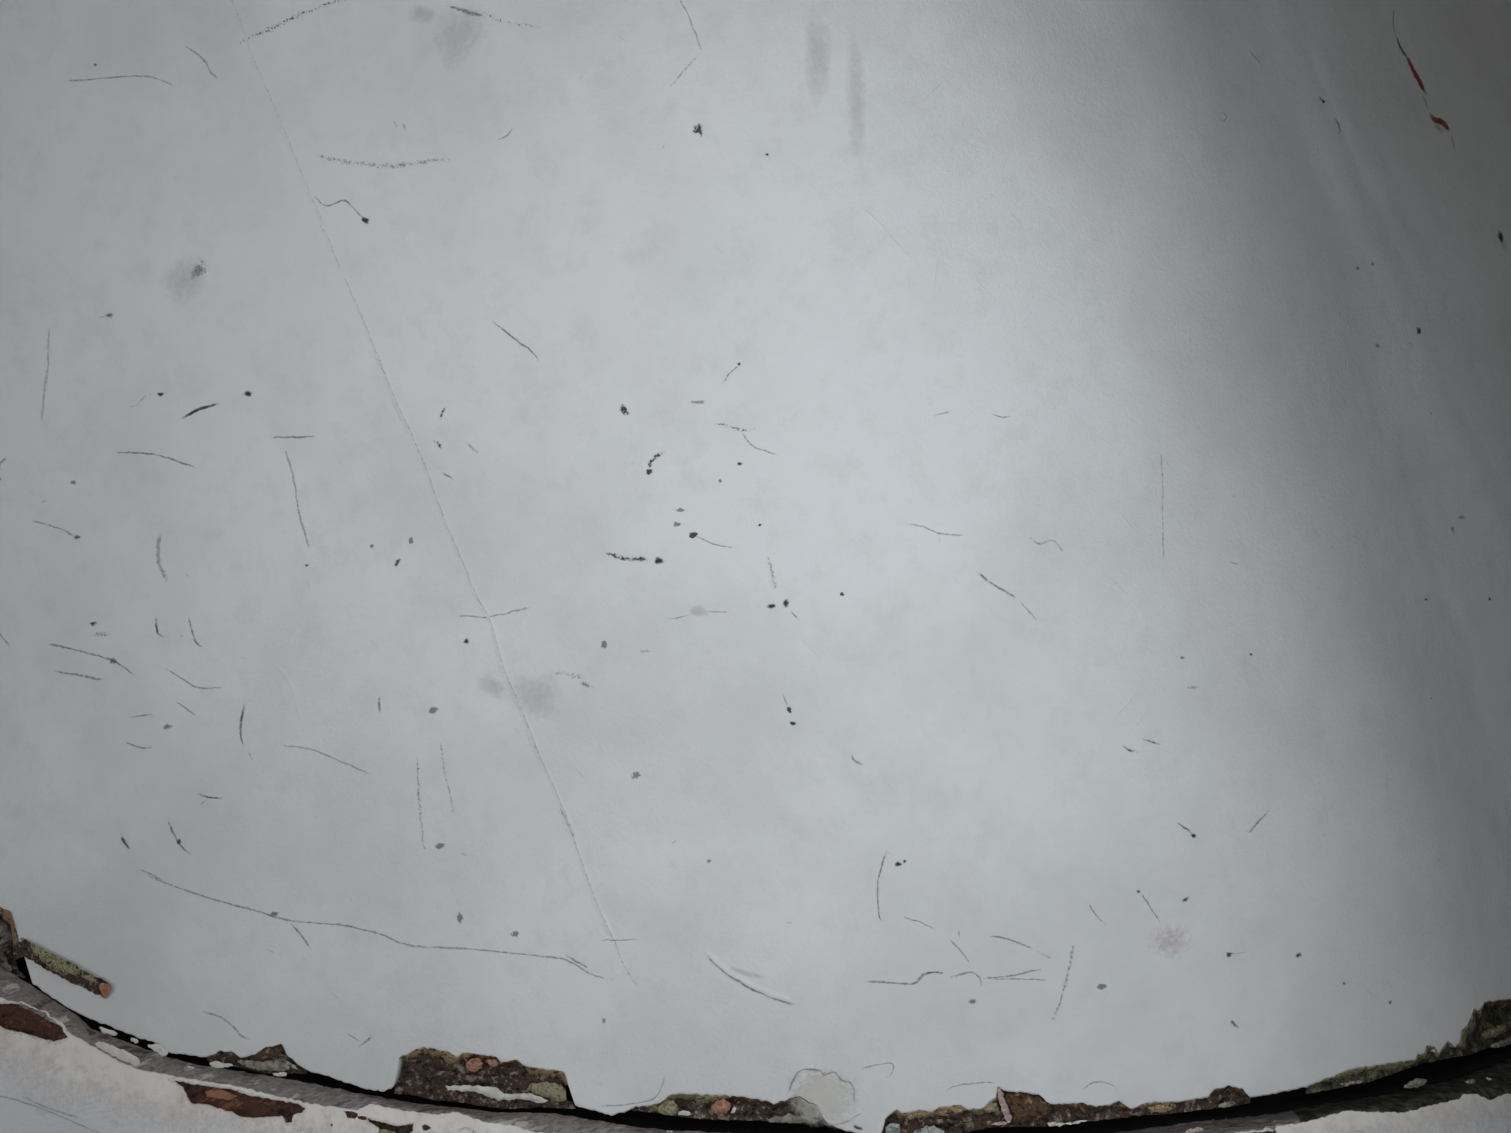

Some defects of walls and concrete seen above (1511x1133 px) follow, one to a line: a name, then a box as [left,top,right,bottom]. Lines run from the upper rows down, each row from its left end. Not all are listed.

flaking render [0,907,112,998]
peeling [0,998,575,1133]
flaking render [632,1093,832,1126]
flaking render [882,1086,1251,1133]
peeling [1235,1094,1511,1133]
flaking render [1306,999,1511,1094]